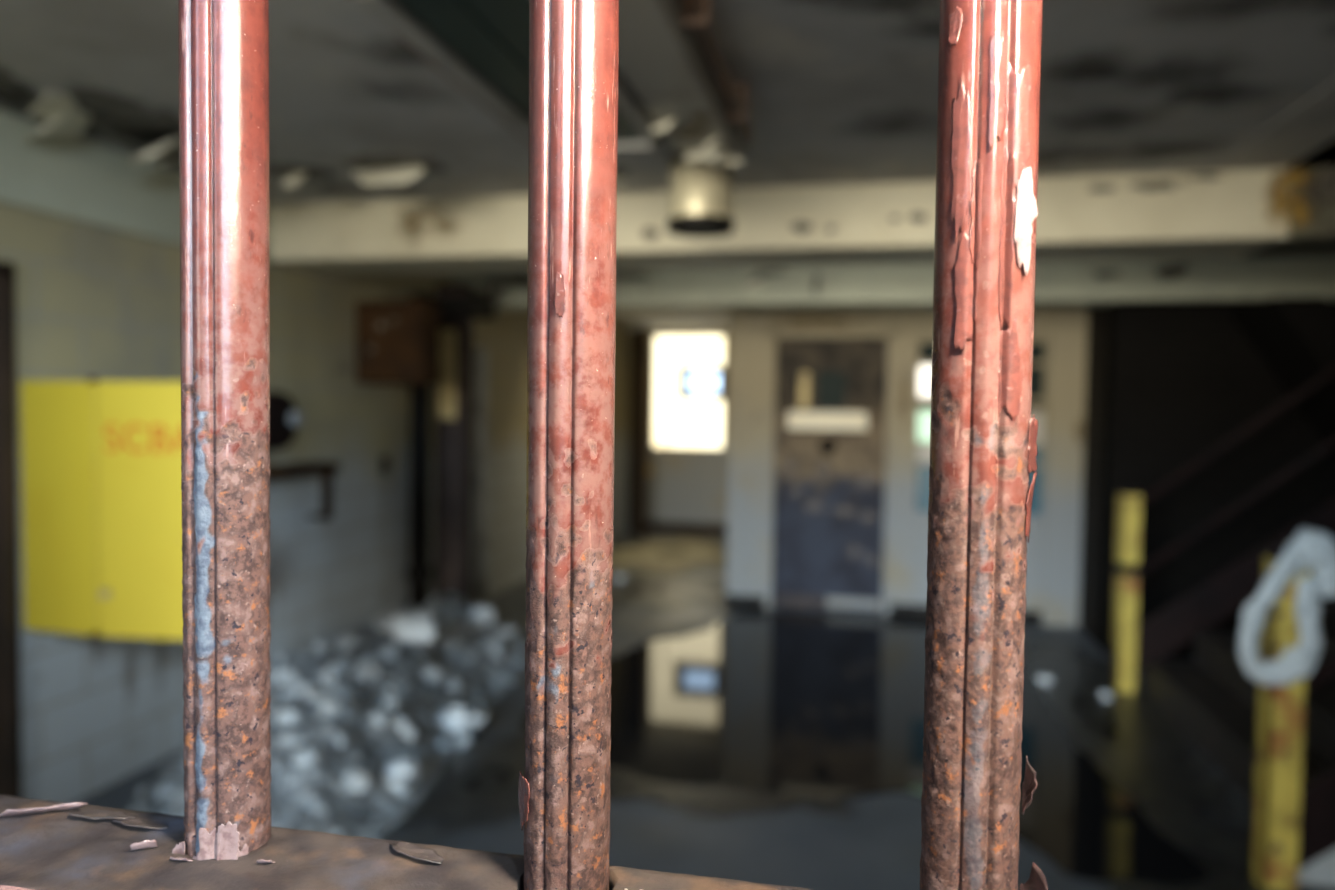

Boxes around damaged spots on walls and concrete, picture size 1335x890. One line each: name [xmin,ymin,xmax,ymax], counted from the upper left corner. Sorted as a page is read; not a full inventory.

peeling [951,29,1038,543]
peeling [172,821,249,860]
peeling [1020,862,1048,890]